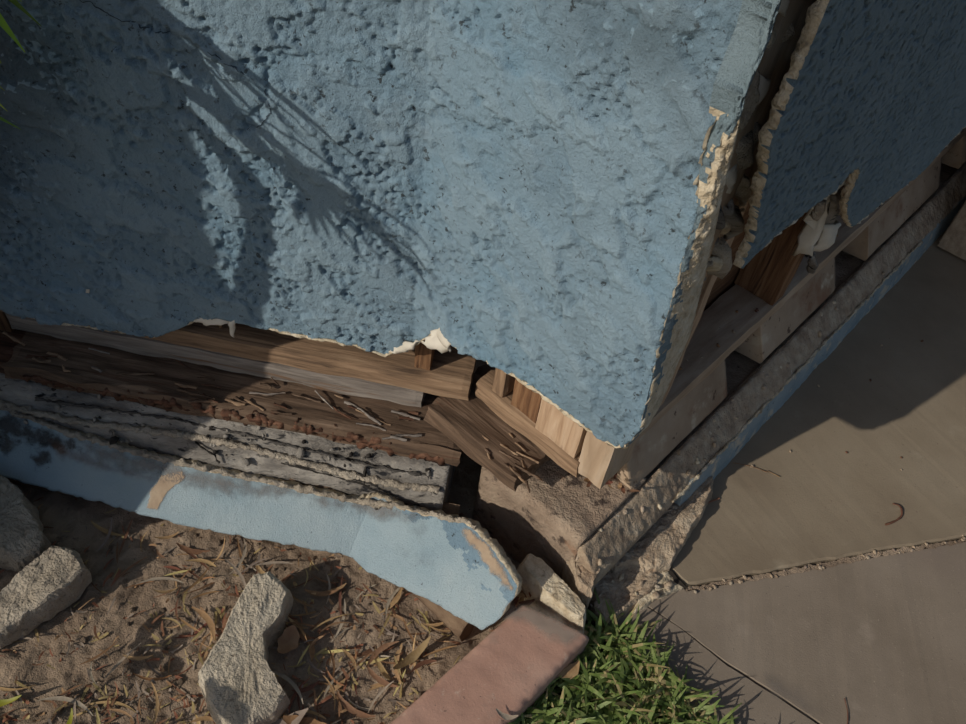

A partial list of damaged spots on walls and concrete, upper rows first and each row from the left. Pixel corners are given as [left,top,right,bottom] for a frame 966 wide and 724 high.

flaking render [605,0,801,449]
flaking render [188,318,236,338]
flaking render [268,328,456,357]
flaking render [504,372,592,433]
spalling [577,164,966,585]
spalling [0,388,512,589]
crack [668,570,688,589]